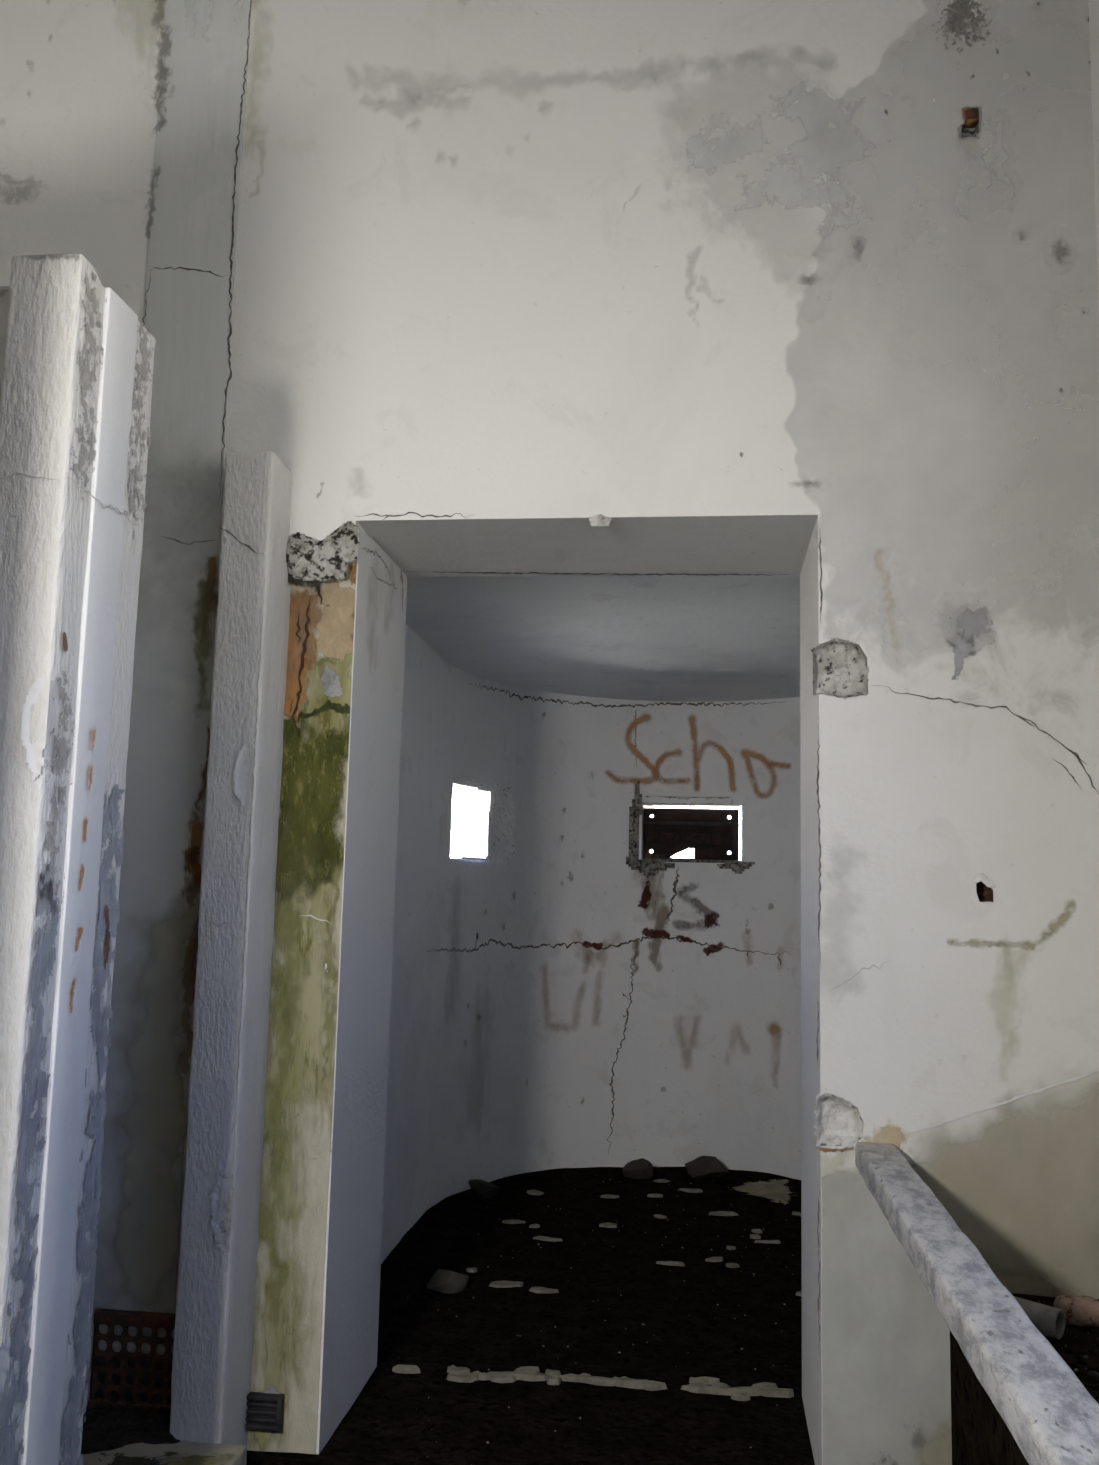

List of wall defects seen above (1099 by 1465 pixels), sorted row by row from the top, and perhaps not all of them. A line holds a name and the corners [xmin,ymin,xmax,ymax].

mould [932,0,999,55]
crack [0,2,258,554]
spalling [811,638,869,699]
crack [871,685,1099,794]
flaking render [247,521,360,1454]
crack [428,716,888,1154]
crack [814,1191,822,1355]
water stain [911,1083,1099,1299]